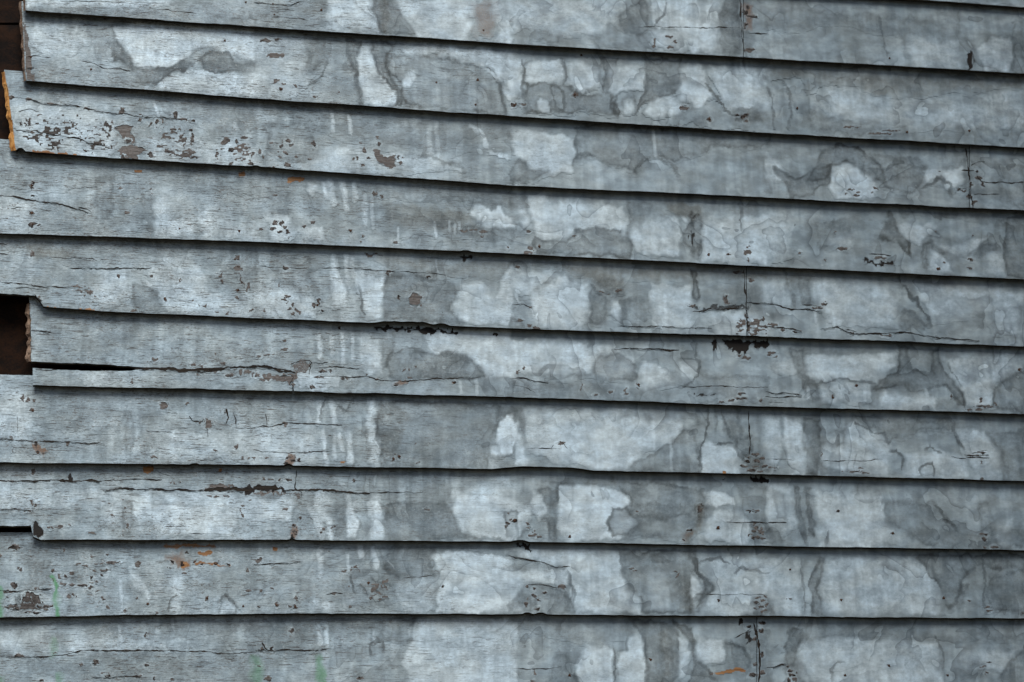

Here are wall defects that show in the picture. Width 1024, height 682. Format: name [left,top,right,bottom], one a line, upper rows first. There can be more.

leakage [9,91,120,158]
peeling [18,110,200,161]
leakage [26,0,1024,201]
crack [765,300,980,342]
crack [135,362,478,383]
leakage [0,163,1024,682]
crack [0,414,422,500]
peeling [0,542,55,616]
rust [163,543,232,577]